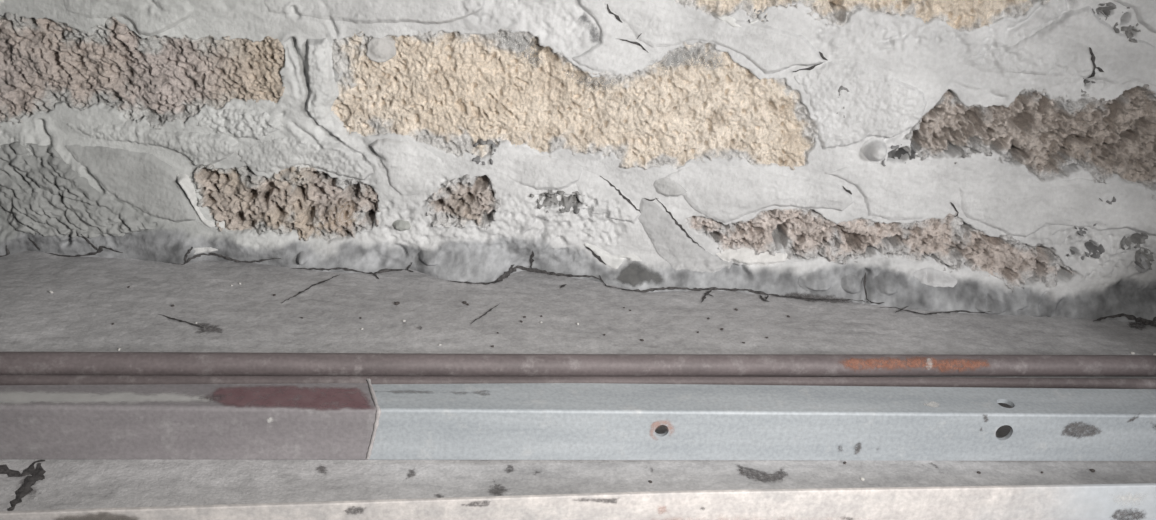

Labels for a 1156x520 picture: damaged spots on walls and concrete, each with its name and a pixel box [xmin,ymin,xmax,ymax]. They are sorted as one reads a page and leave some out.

spalling [472,139,496,165]
spalling [881,142,916,167]
peeling [177,174,226,228]
peeling [716,244,788,266]
crack [173,247,413,303]
crack [452,247,990,323]
peeling [913,267,957,287]
crack [158,314,203,328]
crack [1094,313,1156,327]